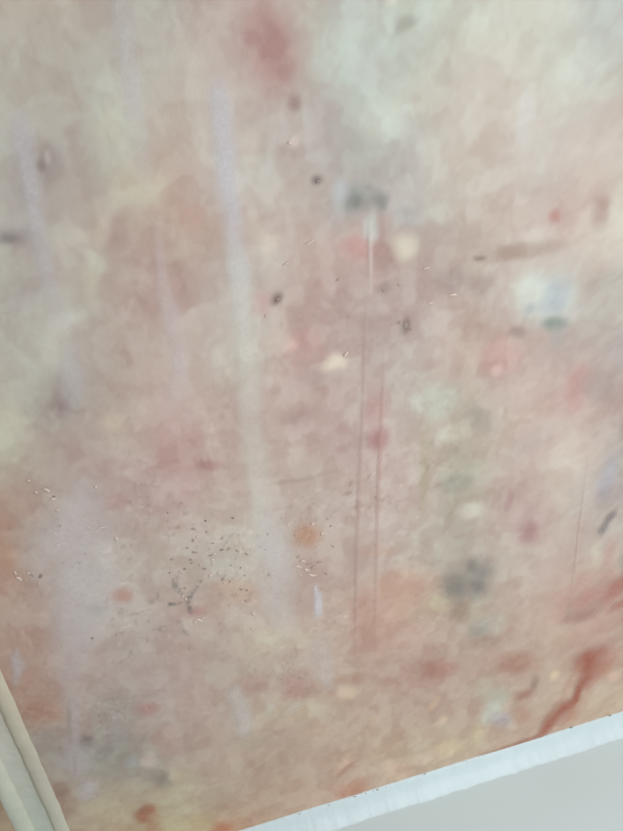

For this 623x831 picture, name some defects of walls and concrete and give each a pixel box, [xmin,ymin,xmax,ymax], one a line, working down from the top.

leakage [169,520,323,623]
corrosion [497,648,613,751]